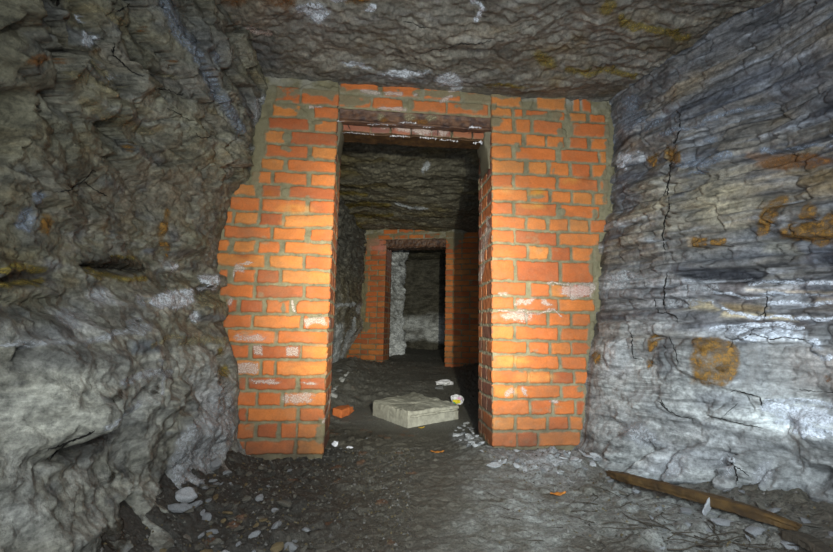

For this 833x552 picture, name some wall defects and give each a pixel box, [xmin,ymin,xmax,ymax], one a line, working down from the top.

crack [654,107,683,365]
damp [549,282,596,299]
damp [501,298,561,323]
crack [726,292,814,348]
damp [220,334,279,384]
damp [282,382,315,403]
crack [658,390,765,428]
crack [731,457,749,482]